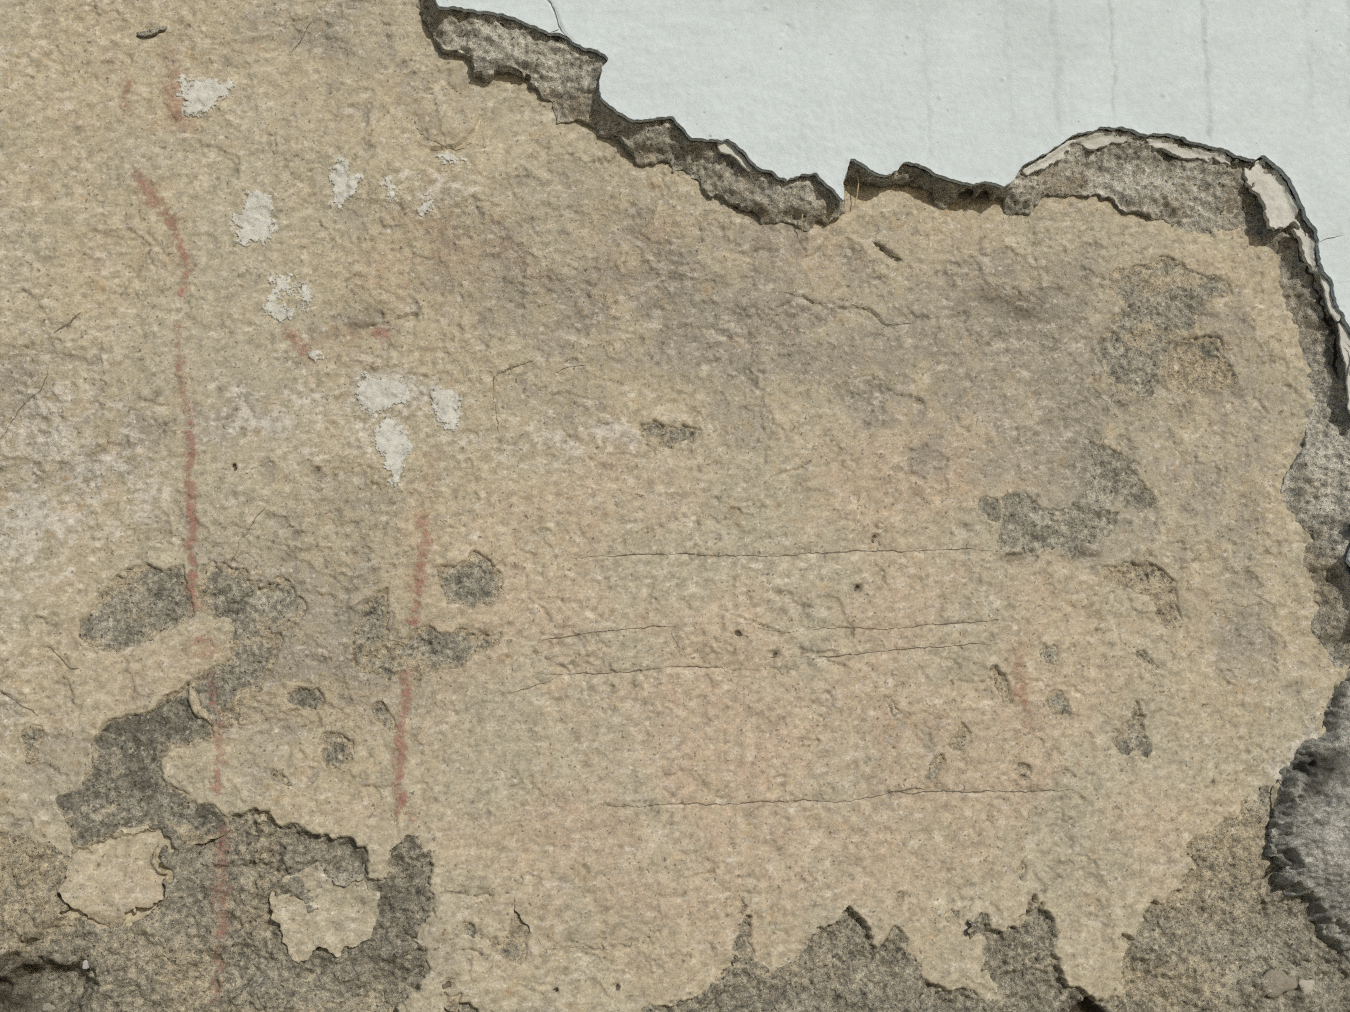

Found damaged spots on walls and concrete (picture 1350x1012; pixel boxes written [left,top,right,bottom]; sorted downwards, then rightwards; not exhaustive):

peeling [136,26,168,38]
spalling [416,0,1350,671]
peeling [373,414,413,487]
rust [186,418,198,606]
spalling [351,588,502,684]
spalling [0,561,435,1012]
spalling [925,723,969,783]
spalling [1045,691,1072,715]
spalling [1111,701,1152,759]
spalling [641,785,1350,1012]
spalling [462,911,530,965]
spalling [443,981,478,1012]